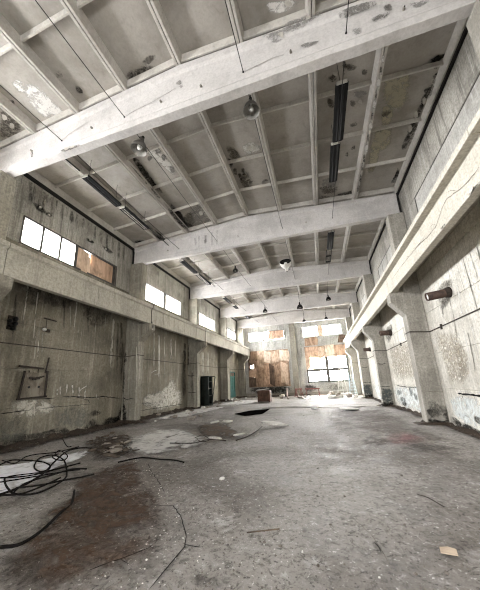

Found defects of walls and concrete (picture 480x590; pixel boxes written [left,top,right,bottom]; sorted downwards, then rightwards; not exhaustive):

peeling [269,15,319,42]
peeling [340,2,376,18]
peeling [0,111,20,137]
spalling [402,54,445,149]
leakage [23,286,77,359]
leakage [86,307,126,426]
leakage [333,385,480,449]